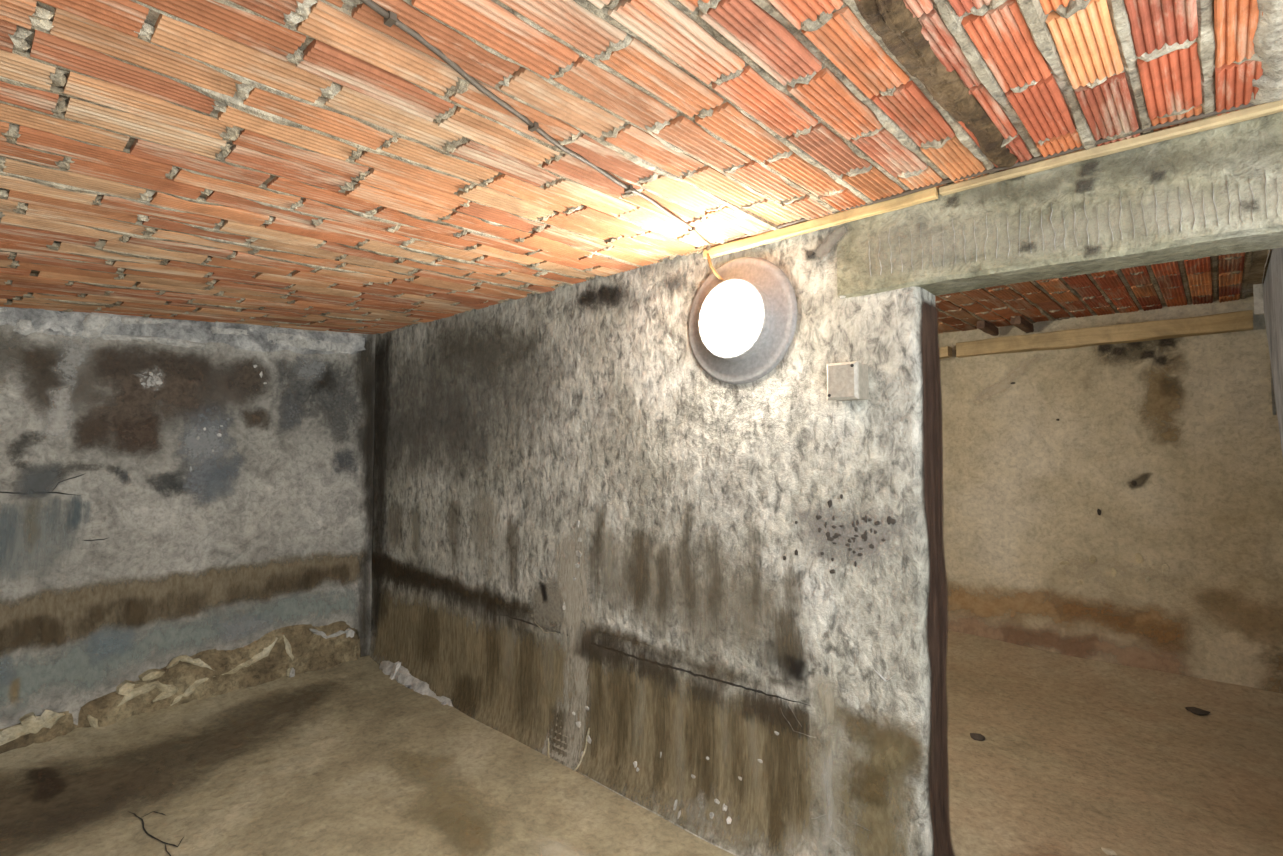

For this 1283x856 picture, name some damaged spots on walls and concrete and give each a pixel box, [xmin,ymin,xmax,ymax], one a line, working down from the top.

spalling [0,621,361,754]
damp [0,330,921,856]
damp [948,616,1186,676]
crack [128,811,184,856]